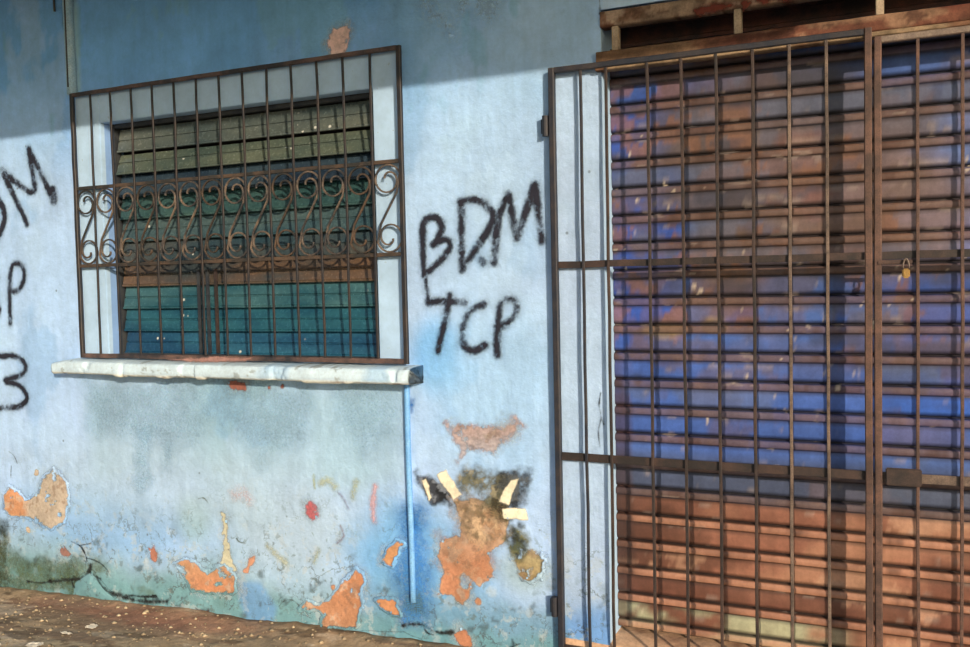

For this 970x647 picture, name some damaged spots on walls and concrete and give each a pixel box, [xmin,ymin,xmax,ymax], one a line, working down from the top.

peeling [324,24,352,60]
spalling [228,379,248,391]
peeling [443,417,524,458]
peeling [2,466,71,533]
peeling [304,500,318,520]
damp [0,522,97,595]
crack [27,543,168,604]
peeling [171,554,256,596]
peeling [381,538,408,569]
peeling [437,498,509,606]
peeling [297,565,403,630]
peeling [454,625,474,647]